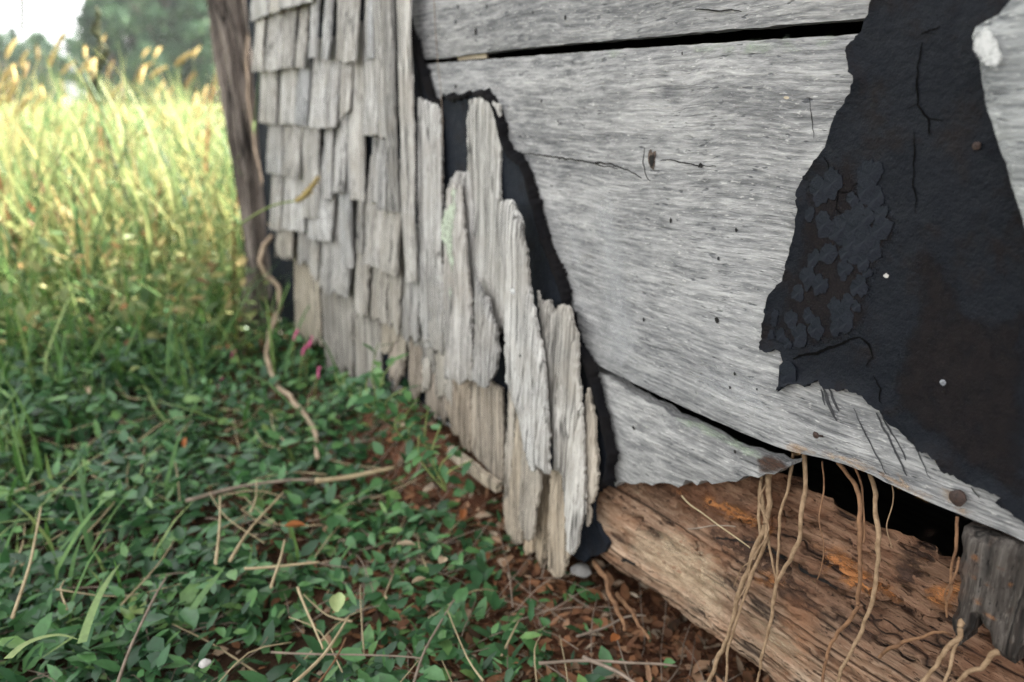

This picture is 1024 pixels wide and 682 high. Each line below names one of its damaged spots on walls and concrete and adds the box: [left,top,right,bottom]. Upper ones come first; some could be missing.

peeling [974,27,1000,66]
crack [908,26,944,209]
crack [521,148,714,181]
spalling [820,387,839,421]
spalling [876,413,930,478]